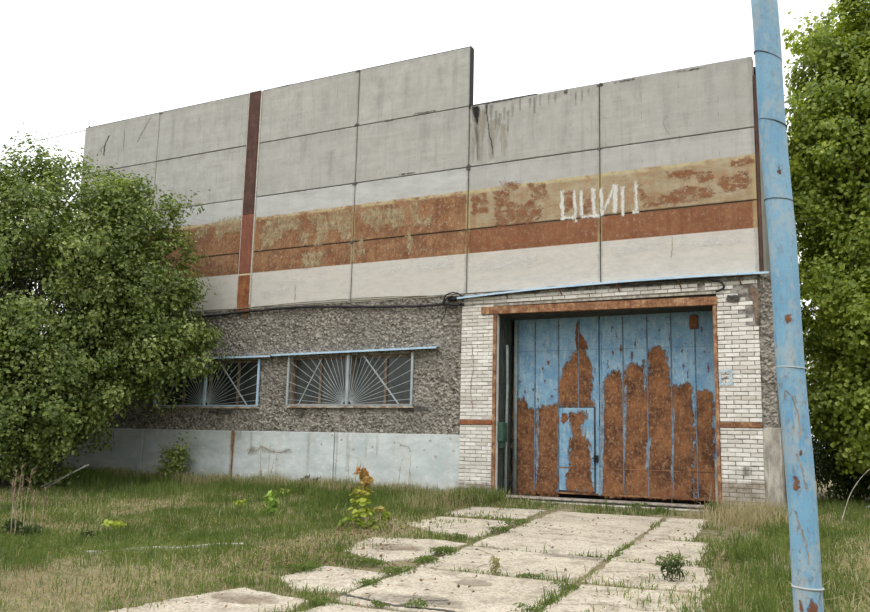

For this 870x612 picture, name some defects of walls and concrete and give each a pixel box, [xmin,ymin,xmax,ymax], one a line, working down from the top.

damp [471,105,493,154]
corrosion [798,599,818,612]